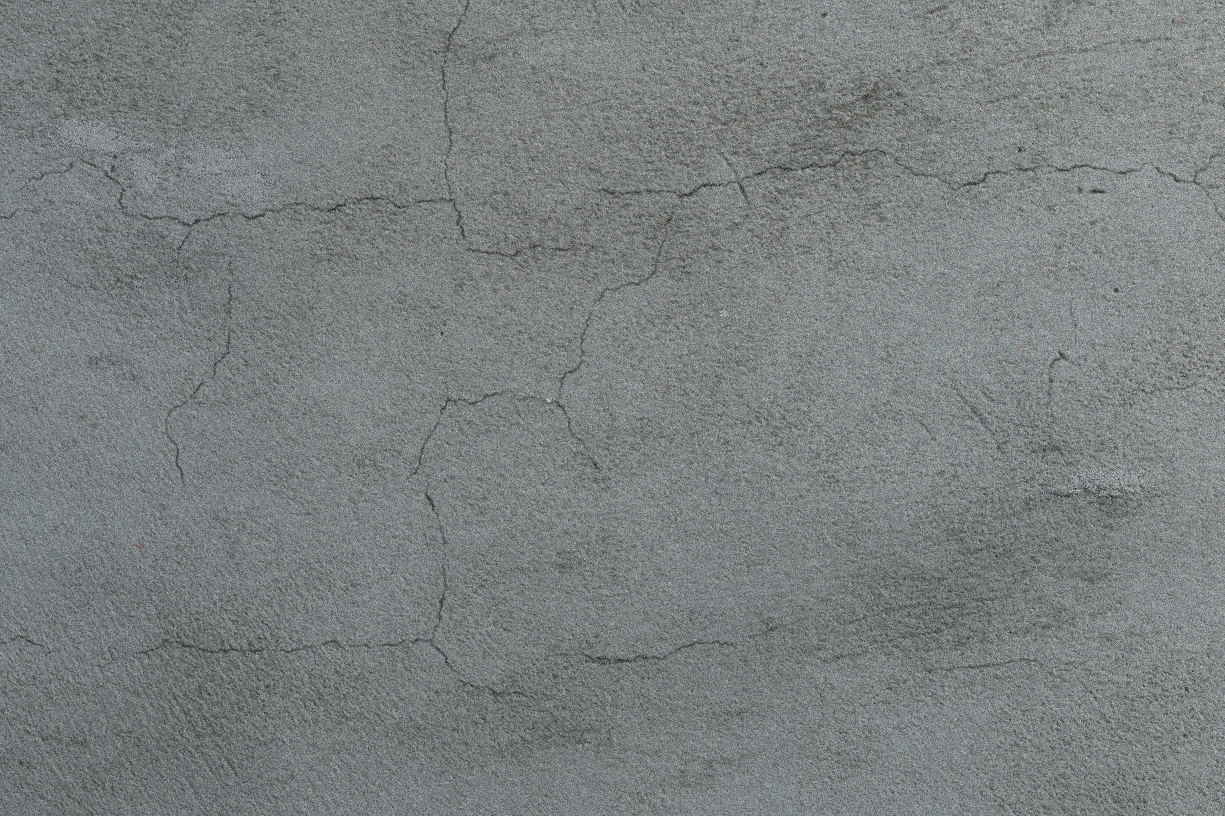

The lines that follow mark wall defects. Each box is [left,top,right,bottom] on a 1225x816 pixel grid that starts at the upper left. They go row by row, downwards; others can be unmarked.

crack [69,0,569,256]
crack [604,150,903,221]
crack [963,165,1198,186]
crack [415,393,498,510]
crack [366,598,499,695]